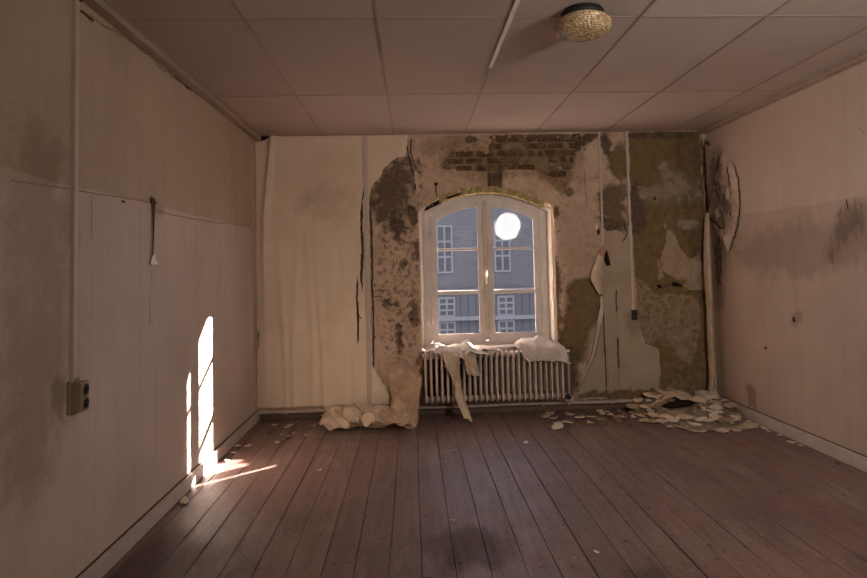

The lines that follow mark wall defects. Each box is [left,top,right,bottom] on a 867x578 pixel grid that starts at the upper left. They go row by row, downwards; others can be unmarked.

flaking render [424,133,587,211]